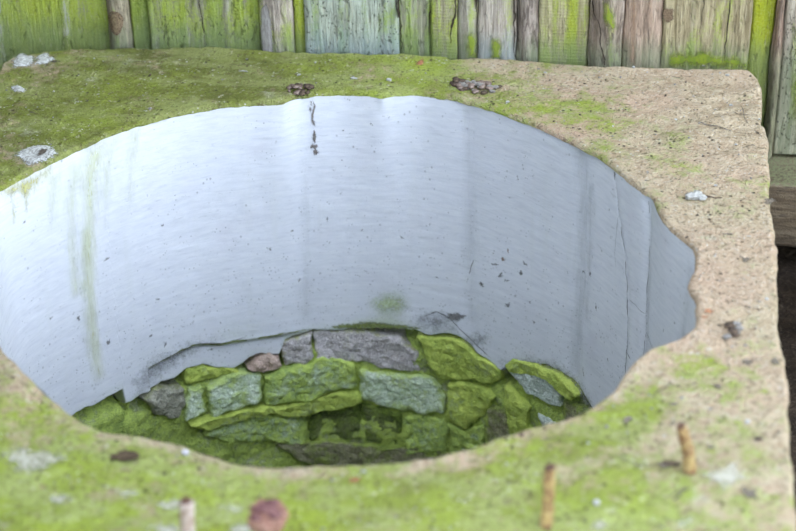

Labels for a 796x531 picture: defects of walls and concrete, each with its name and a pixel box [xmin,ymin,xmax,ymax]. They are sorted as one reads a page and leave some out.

crack [614,196,650,374]